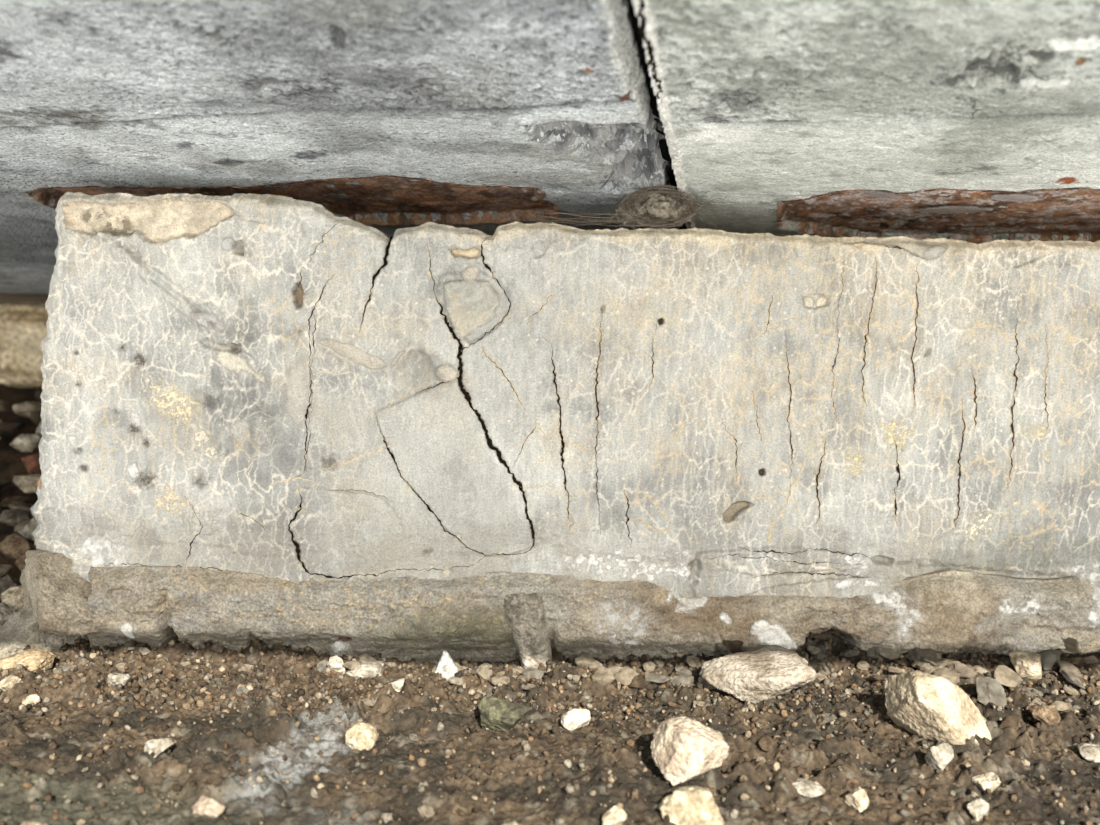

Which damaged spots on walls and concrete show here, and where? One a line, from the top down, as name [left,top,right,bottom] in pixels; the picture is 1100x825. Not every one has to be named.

crack [637,0,663,101]
rust [24,175,560,227]
rust [776,178,1100,244]
crack [177,220,677,579]
crack [660,393,762,480]
crack [710,242,931,578]
crack [954,377,977,531]
crack [1003,262,1024,485]